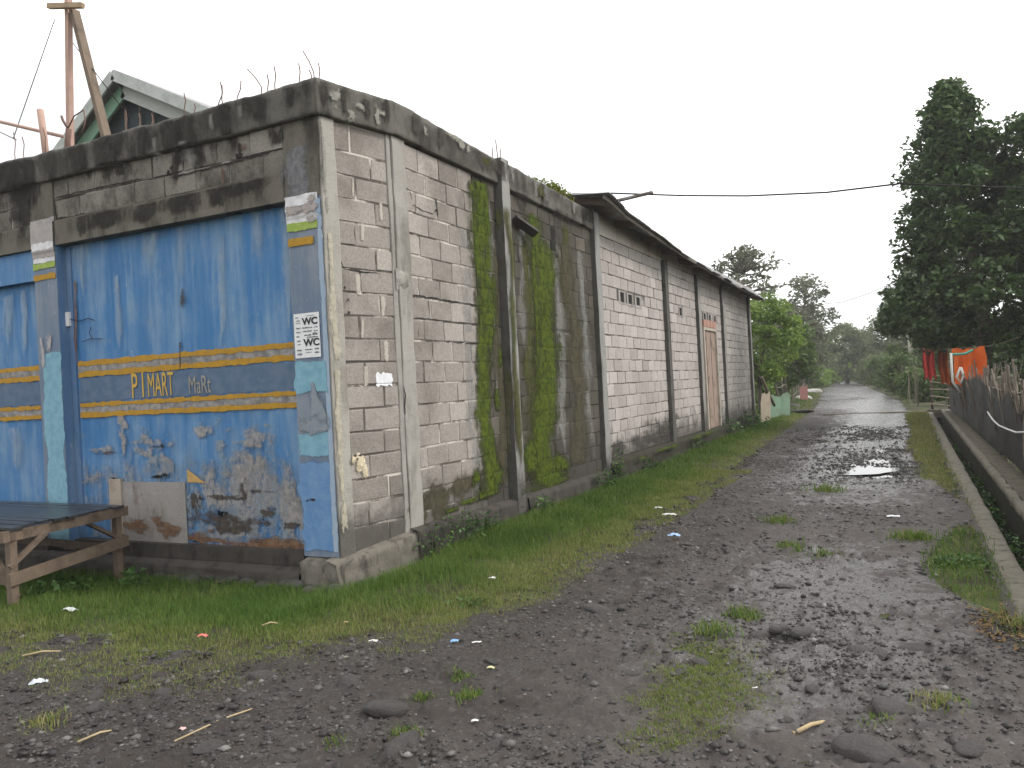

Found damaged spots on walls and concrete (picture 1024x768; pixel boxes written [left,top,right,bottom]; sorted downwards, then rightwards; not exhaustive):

leakage [286,81,328,106]
leakage [0,132,132,231]
leakage [77,179,261,235]
leakage [137,95,321,197]
peeling [285,127,329,222]
leakage [550,189,593,466]
peeling [297,232,350,531]
peeling [90,407,174,480]
peeling [187,419,303,546]